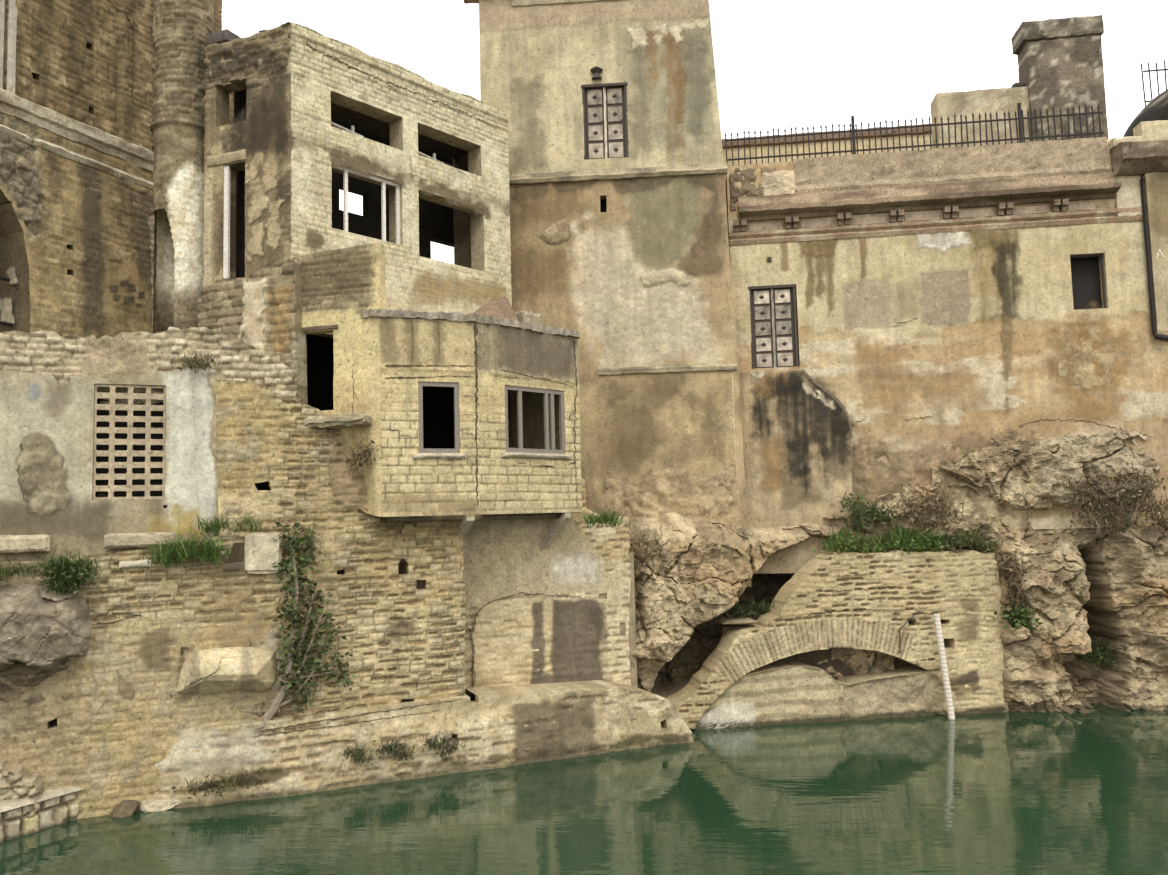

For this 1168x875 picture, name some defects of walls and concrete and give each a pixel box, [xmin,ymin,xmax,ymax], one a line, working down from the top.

water stain [781,239,837,310]
water stain [970,229,1020,377]
spalling [17,432,71,516]
water stain [753,372,854,507]
water stain [552,554,599,584]
water stain [531,600,607,684]
water stain [514,699,593,759]